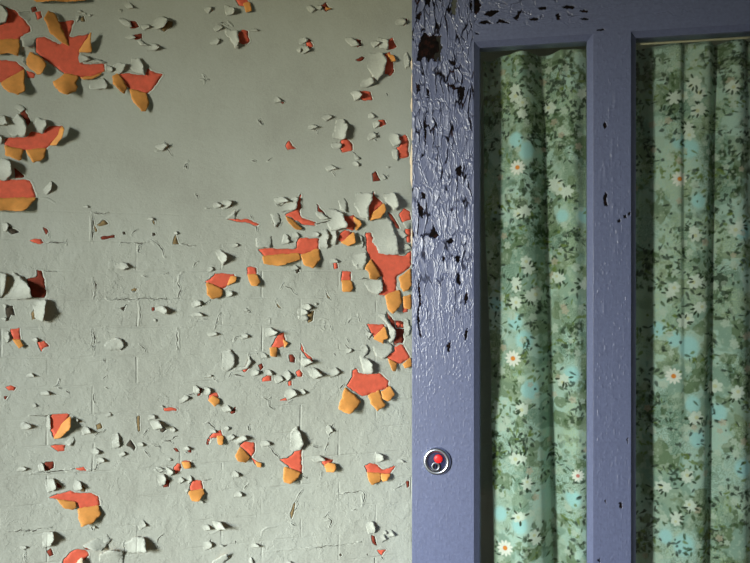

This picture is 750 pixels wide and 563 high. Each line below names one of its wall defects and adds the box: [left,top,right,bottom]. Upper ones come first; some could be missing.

peeling [0,0,165,112]
peeling [118,2,175,51]
peeling [210,0,258,48]
peeling [0,104,65,211]
peeling [0,268,57,348]
peeling [191,112,412,414]
crack [412,0,750,563]
peeling [17,403,212,563]
peeling [202,421,337,484]
peeling [362,452,411,491]